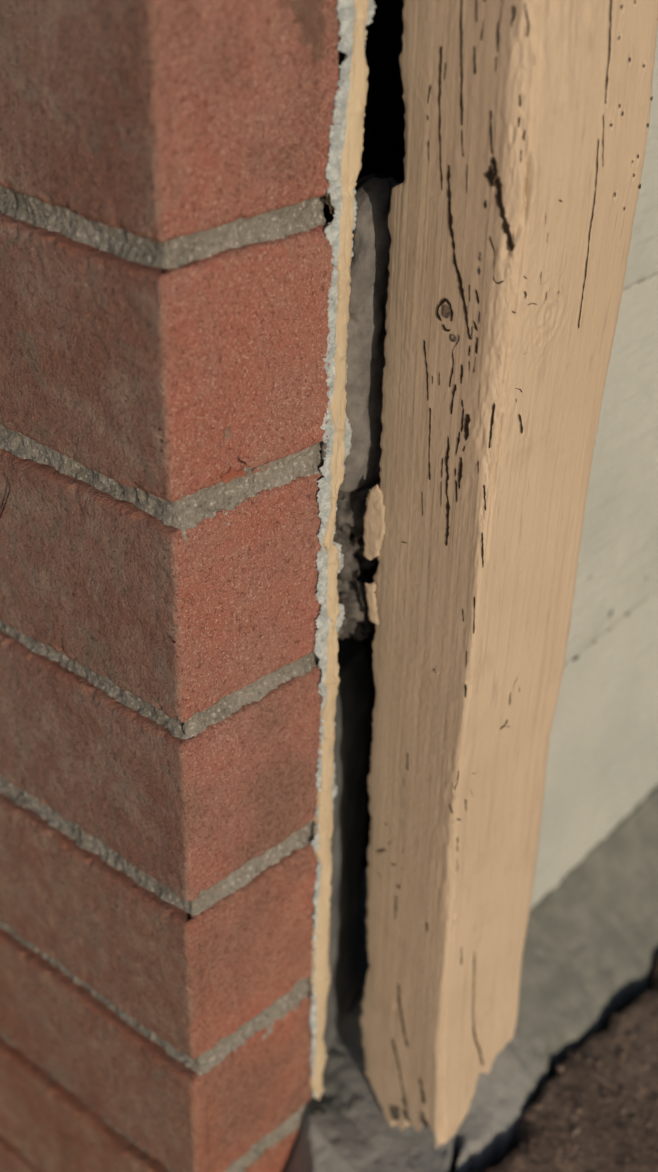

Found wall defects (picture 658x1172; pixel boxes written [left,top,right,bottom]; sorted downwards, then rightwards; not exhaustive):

peeling [364,0,376,58]
crack [512,0,612,328]
crack [422,0,503,546]
peeling [343,416,353,473]
peeling [333,526,344,573]
peeling [363,485,386,560]
peeling [336,595,345,633]
peeling [365,582,379,625]
crack [392,984,408,1105]